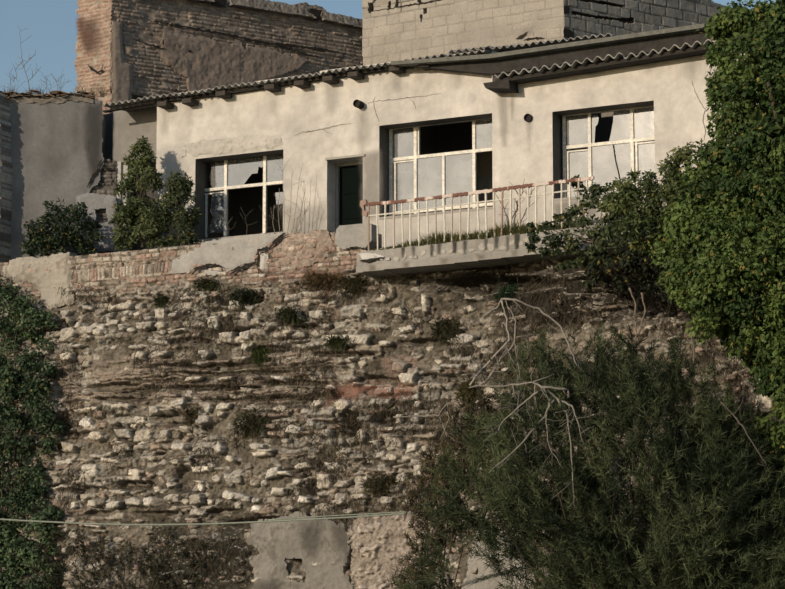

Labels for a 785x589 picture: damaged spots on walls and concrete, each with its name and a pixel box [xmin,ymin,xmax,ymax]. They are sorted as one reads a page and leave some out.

crack [369,0,441,12]
peeling [156,29,308,92]
crack [370,93,441,120]
peeling [168,230,334,277]
peeling [2,252,77,309]